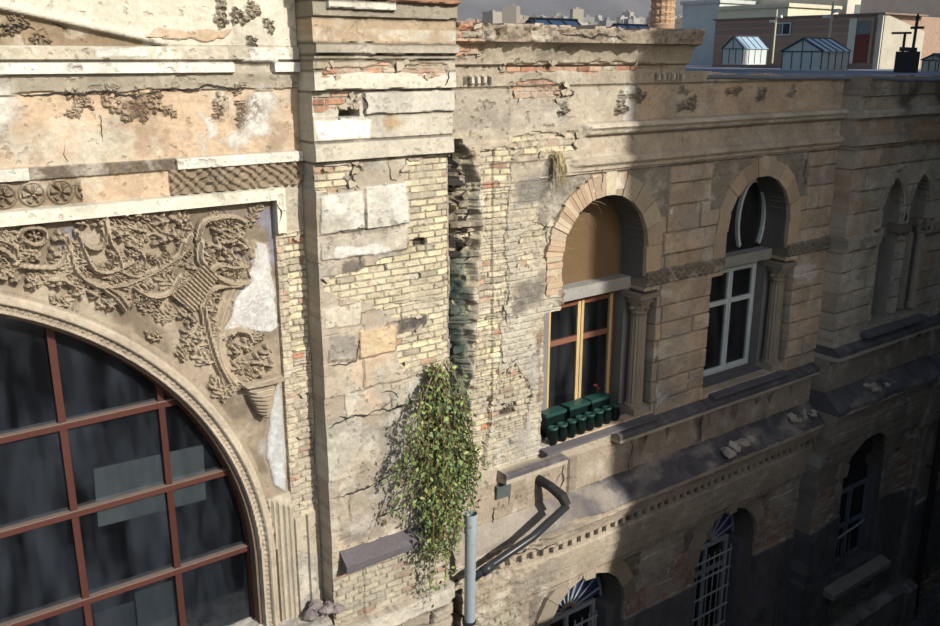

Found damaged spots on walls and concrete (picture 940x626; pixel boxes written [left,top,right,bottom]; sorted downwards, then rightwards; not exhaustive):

spalling [322,59,445,81]
crack [17,84,240,99]
spalling [312,91,362,113]
spalling [455,130,581,482]
spalling [230,231,316,509]
crack [330,388,424,428]
crack [333,467,412,499]